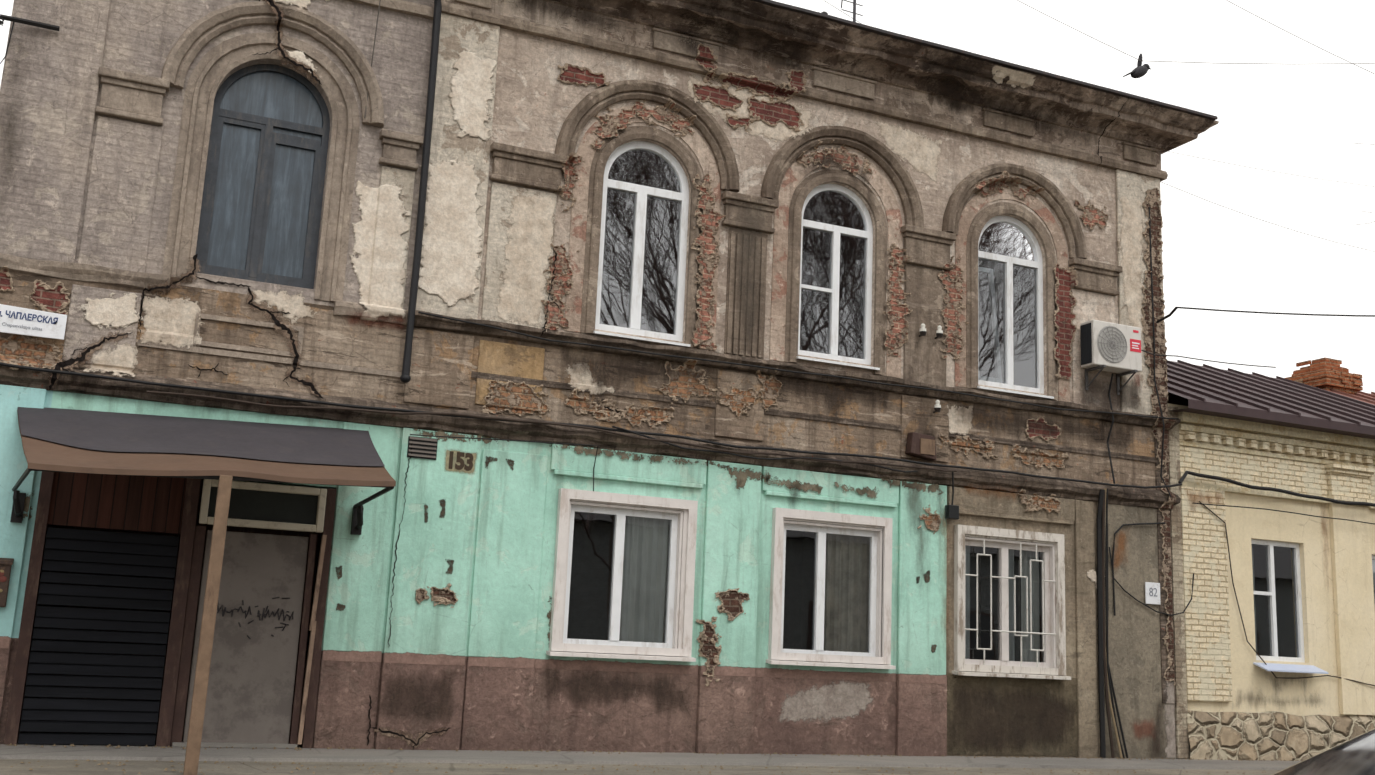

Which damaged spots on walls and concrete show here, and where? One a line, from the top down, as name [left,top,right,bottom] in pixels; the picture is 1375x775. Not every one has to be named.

crack [252,0,322,85]
leakage [521,0,597,25]
leakage [685,0,817,64]
peeling [349,156,483,322]
peeling [496,43,872,332]
peeling [0,266,205,377]
crack [47,254,323,398]
spalling [481,174,783,429]
spalling [1074,188,1177,758]
peeling [415,560,458,608]
leakage [549,673,683,706]
spalling [696,588,750,686]